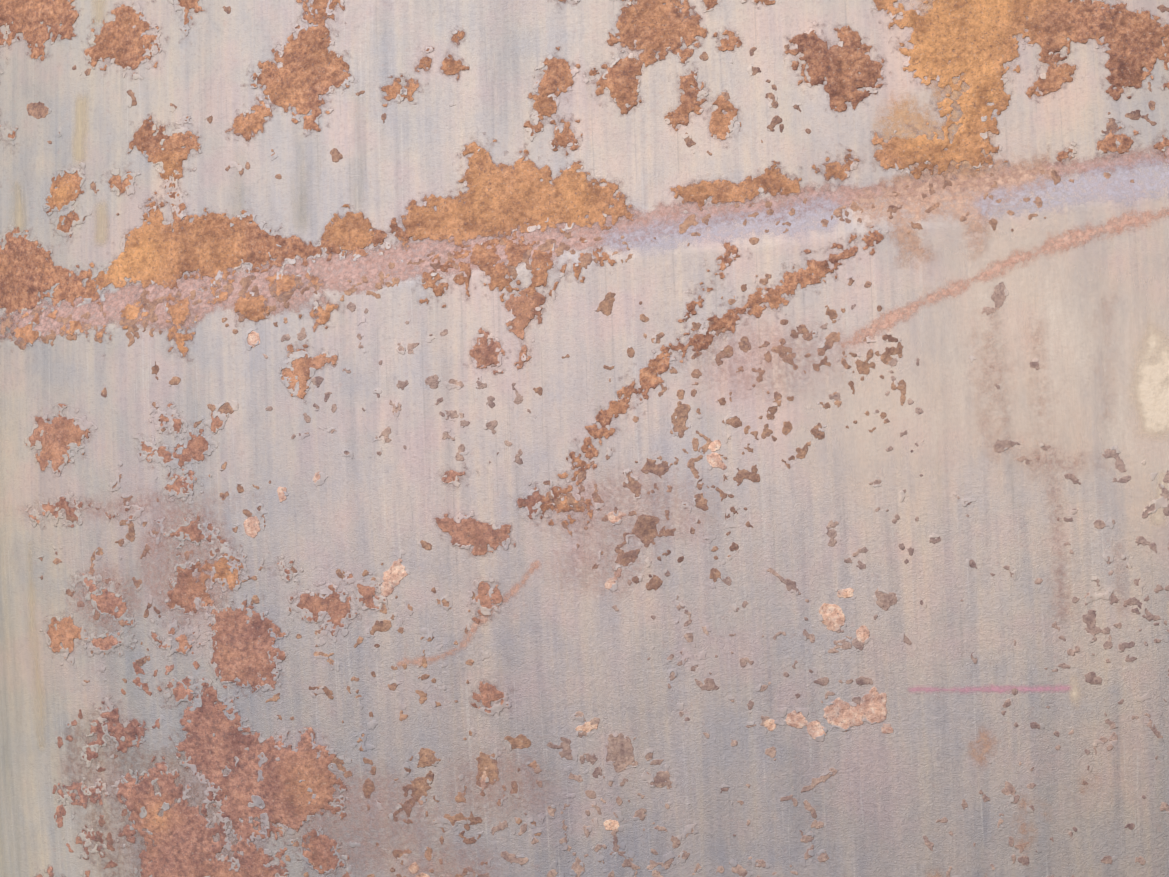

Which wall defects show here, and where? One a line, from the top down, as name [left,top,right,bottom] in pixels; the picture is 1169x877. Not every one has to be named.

corrosion [0,0,1169,399]
peeling [119,274,320,368]
corrosion [25,403,97,477]
peeling [425,354,523,464]
spalling [506,185,924,591]
corrosion [435,511,516,556]
corrosion [517,483,558,519]
corrosion [40,403,350,877]
corrosion [262,555,388,637]
peeling [647,595,893,761]
peeling [767,568,900,654]
peeling [328,591,702,877]